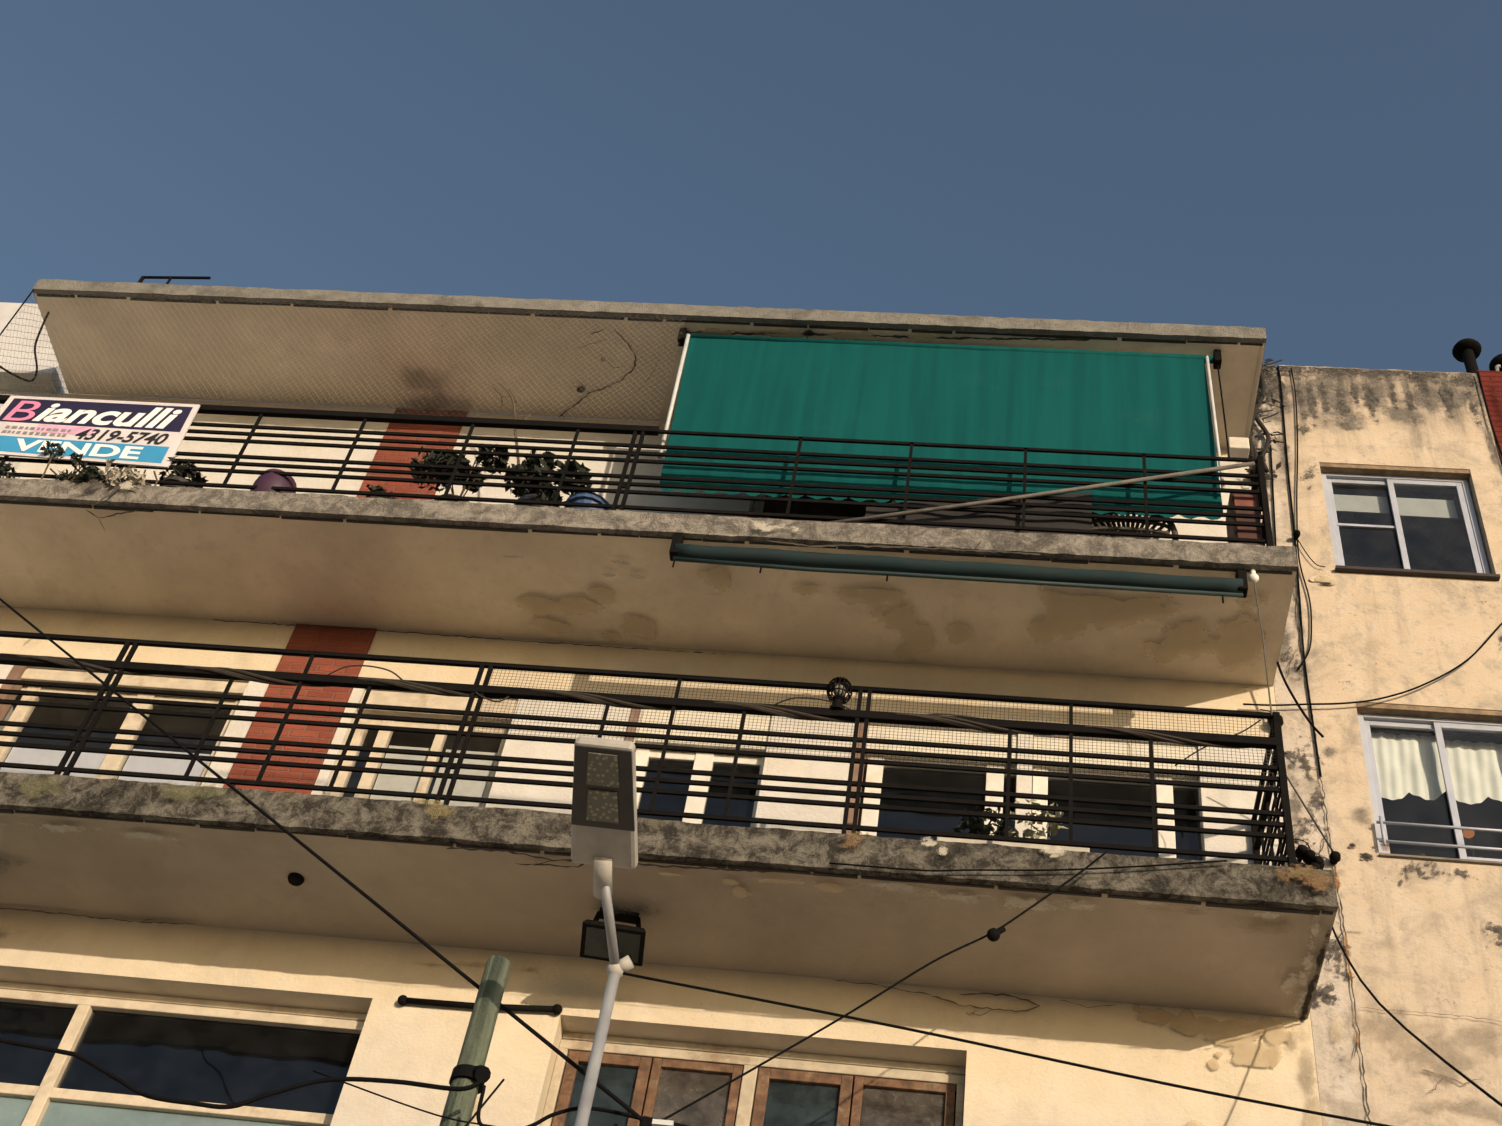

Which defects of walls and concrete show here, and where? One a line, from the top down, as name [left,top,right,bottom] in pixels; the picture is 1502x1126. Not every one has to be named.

crack [558,329,661,419]
water stain [1252,365,1499,490]
water stain [1279,584,1305,680]
water stain [1284,729,1335,850]
peeling [869,882,1096,912]
peeling [1133,916,1320,1070]
peeling [1254,911,1282,920]
water stain [1299,922,1356,1023]
water stain [1480,921,1502,945]